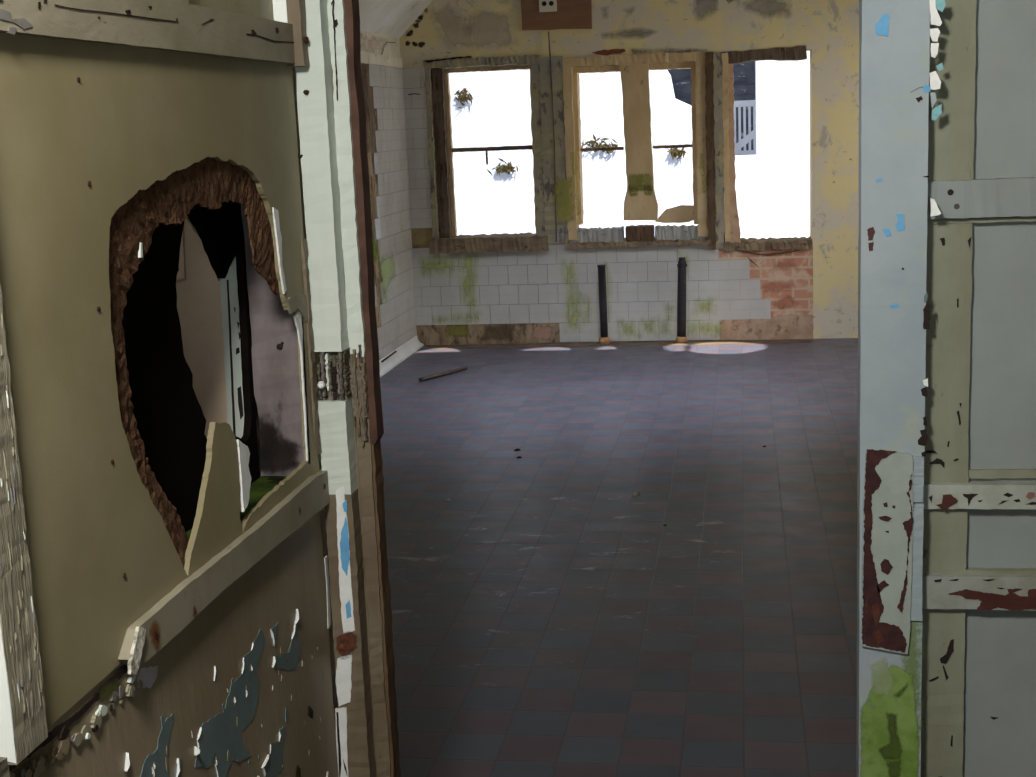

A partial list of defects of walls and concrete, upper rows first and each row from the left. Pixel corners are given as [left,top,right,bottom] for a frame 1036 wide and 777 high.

peeling [910,0,946,120]
peeling [360,35,383,328]
peeling [930,198,941,216]
flaking render [718,242,814,340]
peeling [929,494,982,510]
peeling [9,665,158,777]
peeling [125,609,303,777]
peeling [326,652,352,777]
peeling [324,486,355,634]
corrosion [336,632,357,656]
water stain [879,713,902,777]
peeling [934,579,1036,611]